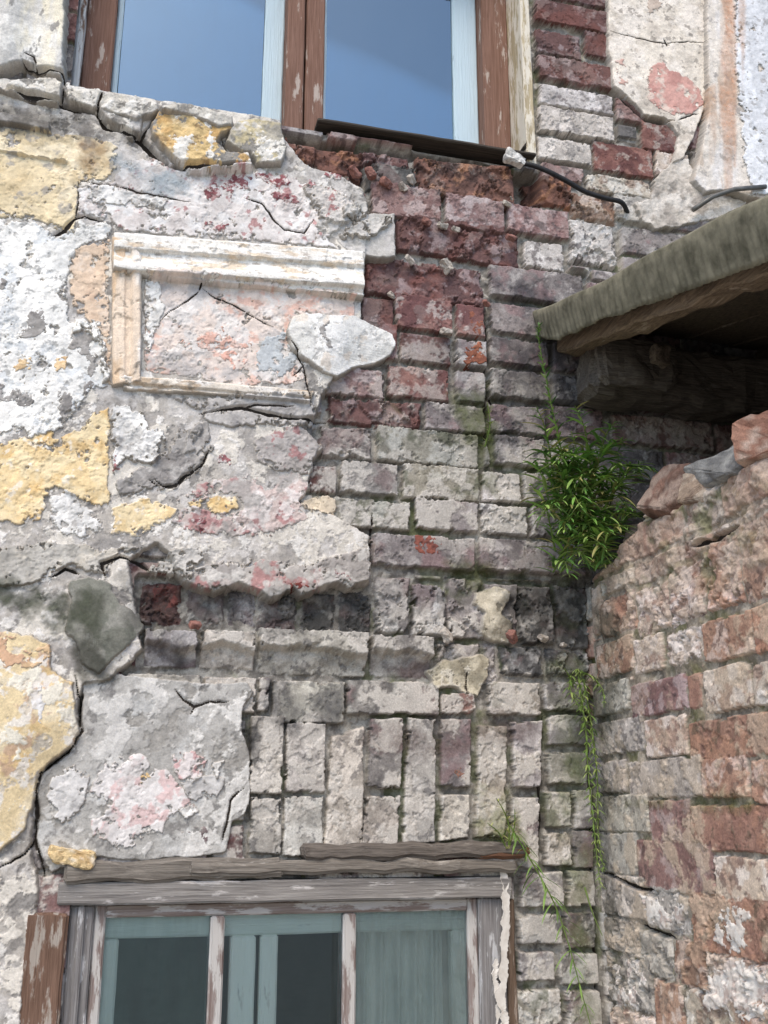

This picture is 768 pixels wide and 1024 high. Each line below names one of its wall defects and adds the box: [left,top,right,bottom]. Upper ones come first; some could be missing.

peeling [647,0,662,14]
crack [17,52,226,172]
peeling [647,59,704,116]
crack [245,198,314,234]
peeling [0,137,621,439]
crack [161,283,324,425]
spalling [0,267,593,682]
crack [176,690,229,714]
crack [0,677,84,875]
peeling [46,750,225,851]
peeling [703,905,768,1022]